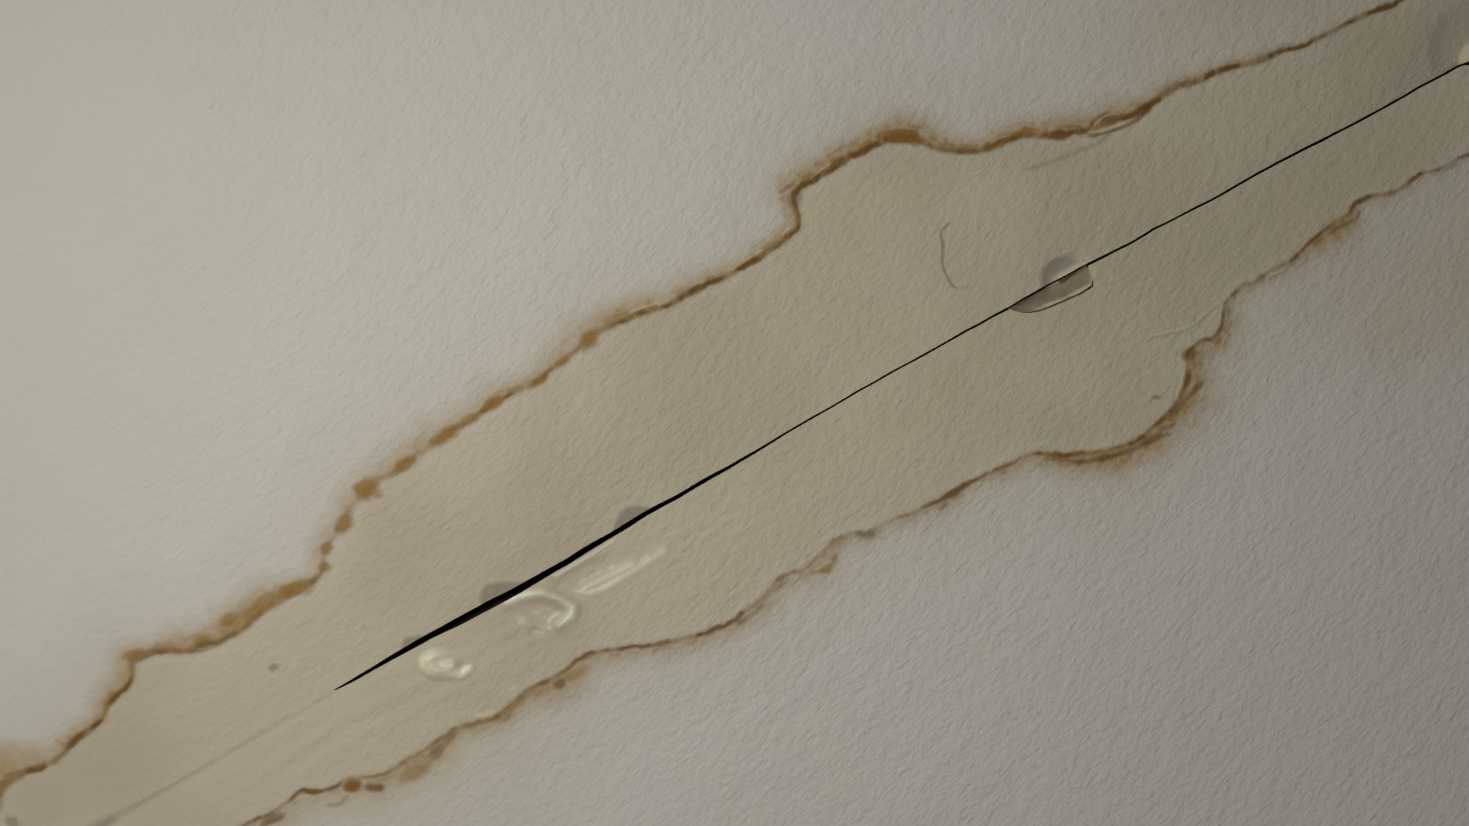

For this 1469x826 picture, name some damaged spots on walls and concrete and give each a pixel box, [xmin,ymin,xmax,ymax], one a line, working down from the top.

damp [1109,0,1408,134]
damp [845,137,892,165]
damp [875,129,927,148]
damp [921,136,993,159]
damp [980,136,1012,153]
damp [1039,128,1072,142]
crack [1042,61,1469,311]
damp [234,149,1469,826]
crack [86,308,1009,826]
damp [150,640,179,653]
damp [185,576,320,655]
damp [23,644,200,779]